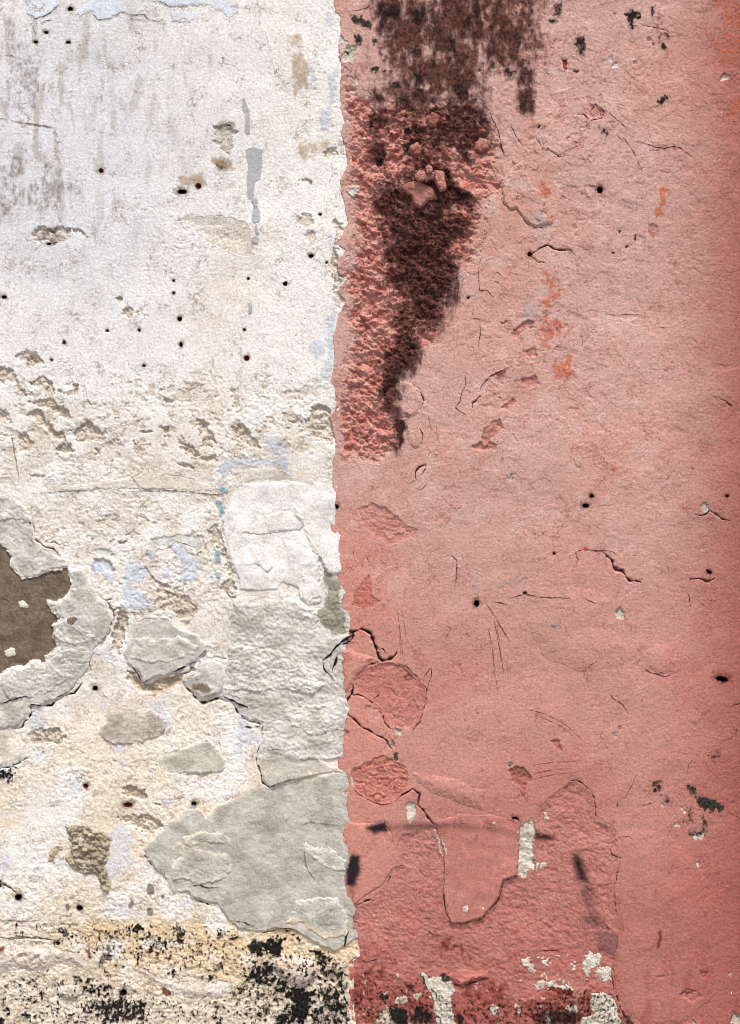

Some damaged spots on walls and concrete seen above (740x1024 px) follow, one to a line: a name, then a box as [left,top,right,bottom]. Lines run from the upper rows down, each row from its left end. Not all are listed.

water stain [345,0,562,451]
crack [453,188,573,339]
spalling [0,544,96,699]
spalling [126,665,196,697]
peeling [91,419,292,655]
crack [322,628,432,749]
crack [579,549,641,583]
peeling [171,831,232,885]
spalling [286,661,630,1024]
crack [427,857,518,936]
water stain [0,903,635,1024]